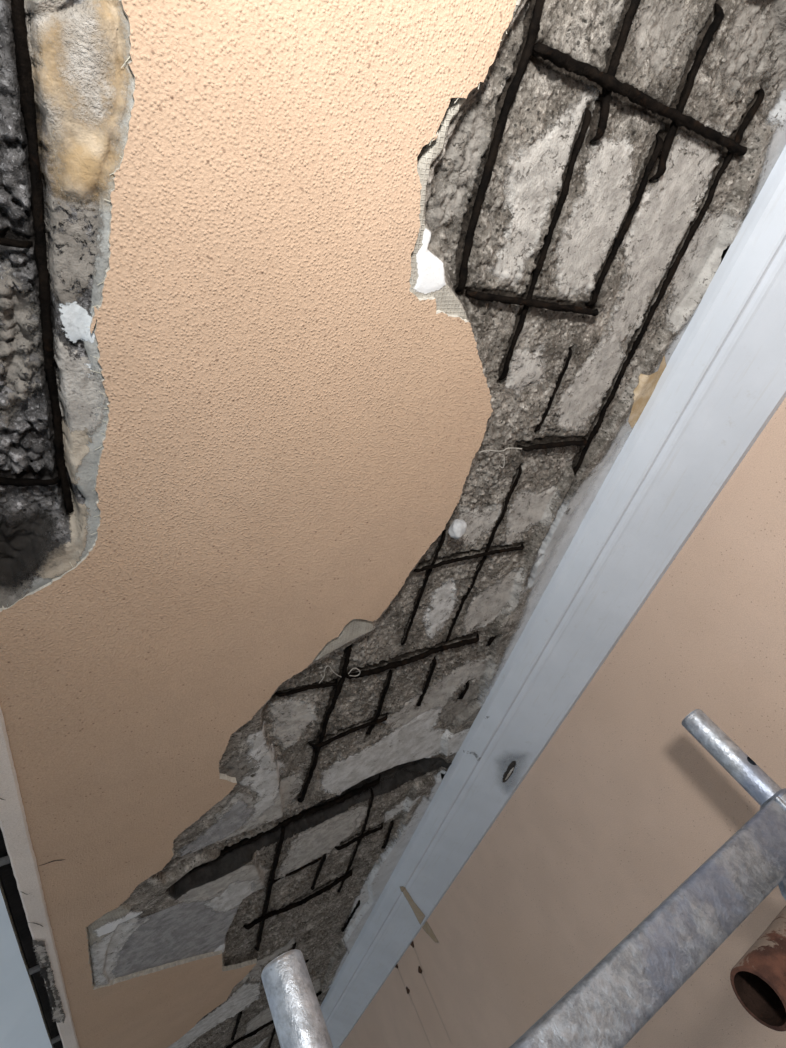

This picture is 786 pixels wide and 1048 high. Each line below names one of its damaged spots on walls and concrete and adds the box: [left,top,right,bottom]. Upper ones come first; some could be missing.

spalling [0,0,134,608]